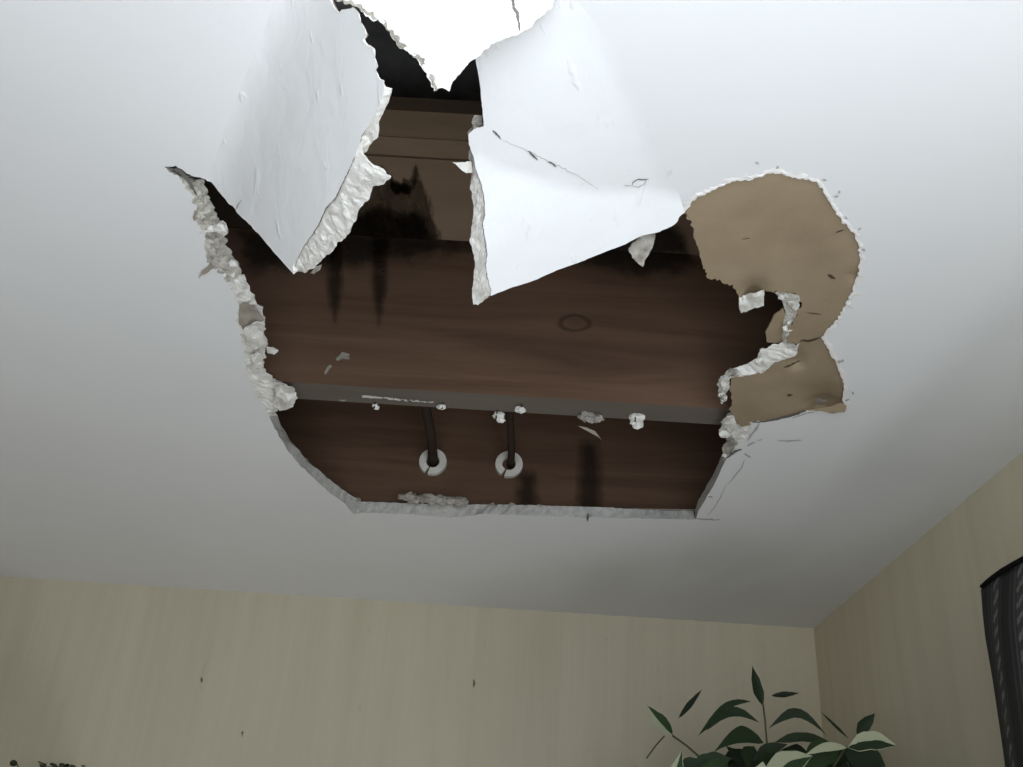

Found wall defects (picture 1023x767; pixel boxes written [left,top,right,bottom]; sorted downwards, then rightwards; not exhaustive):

spalling [330,0,392,169]
peeling [452,149,476,173]
spalling [390,9,549,91]
peeling [467,115,484,137]
crack [493,131,599,190]
spalling [167,169,298,417]
leakage [192,176,283,267]
leakage [321,166,470,310]
leakage [586,226,689,274]
peeling [682,162,867,460]
crack [697,412,814,520]